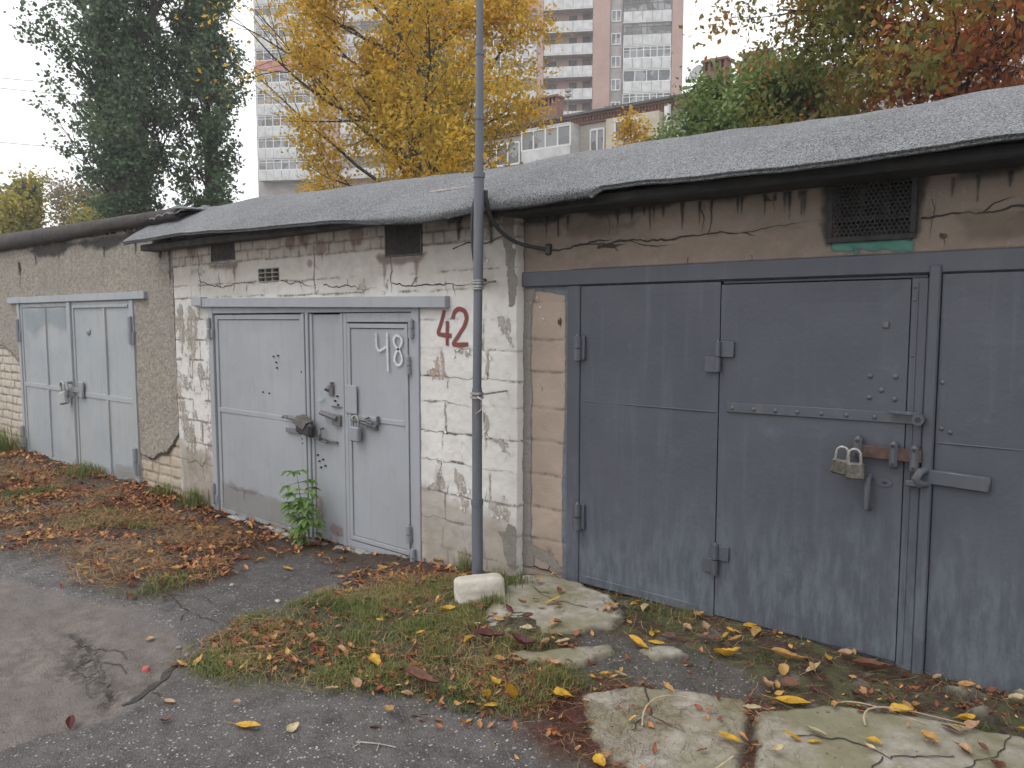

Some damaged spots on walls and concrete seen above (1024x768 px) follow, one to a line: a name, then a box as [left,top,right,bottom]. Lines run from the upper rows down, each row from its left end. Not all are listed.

damp [525,203,684,237]
crack [552,201,820,252]
crack [921,196,1024,229]
crack [281,254,469,294]
crack [170,251,256,364]
spalling [141,304,205,496]
crack [141,393,209,475]
peeling [426,459,470,512]